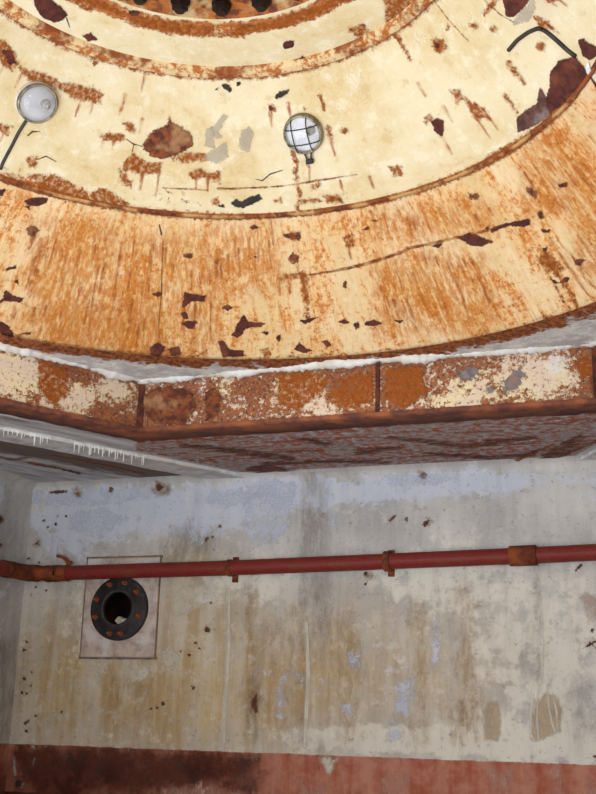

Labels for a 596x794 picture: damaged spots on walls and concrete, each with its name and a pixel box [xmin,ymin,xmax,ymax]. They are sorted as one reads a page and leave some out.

peeling [33,0,70,27]
corrosion [66,0,356,39]
peeling [483,0,535,26]
corrosion [0,40,104,115]
peeling [516,38,596,133]
spalling [142,114,229,163]
corrosion [26,156,129,205]
corrosion [119,153,161,189]
leakage [0,426,52,445]
leakage [72,440,147,465]
corrosion [179,435,596,473]
leakage [250,688,260,713]